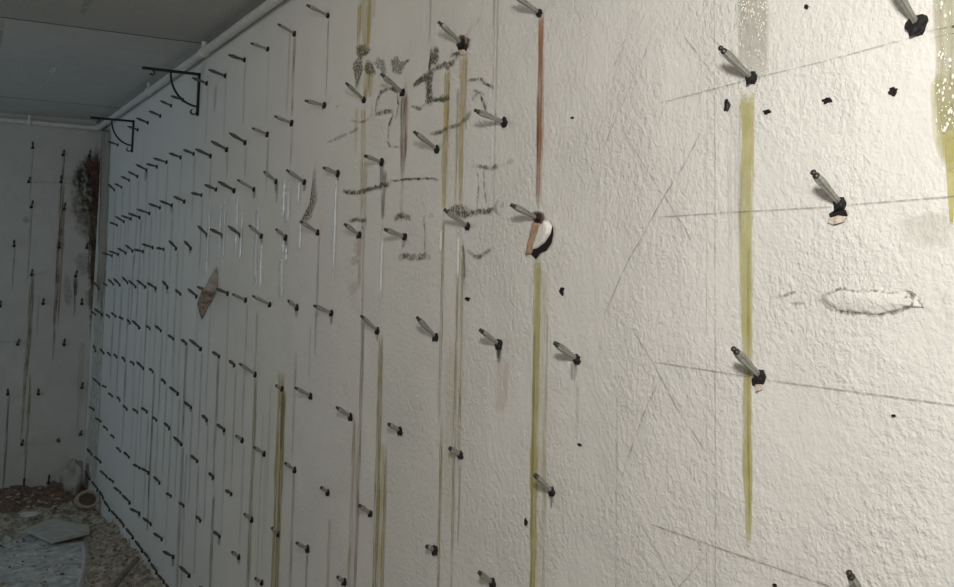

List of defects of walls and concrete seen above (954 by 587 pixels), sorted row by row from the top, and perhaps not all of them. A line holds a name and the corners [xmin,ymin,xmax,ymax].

spalling [525,221,553,259]
water stain [729,99,753,355]
water stain [943,132,954,221]
water stain [272,384,286,587]
water stain [530,264,540,587]
water stain [743,376,752,535]